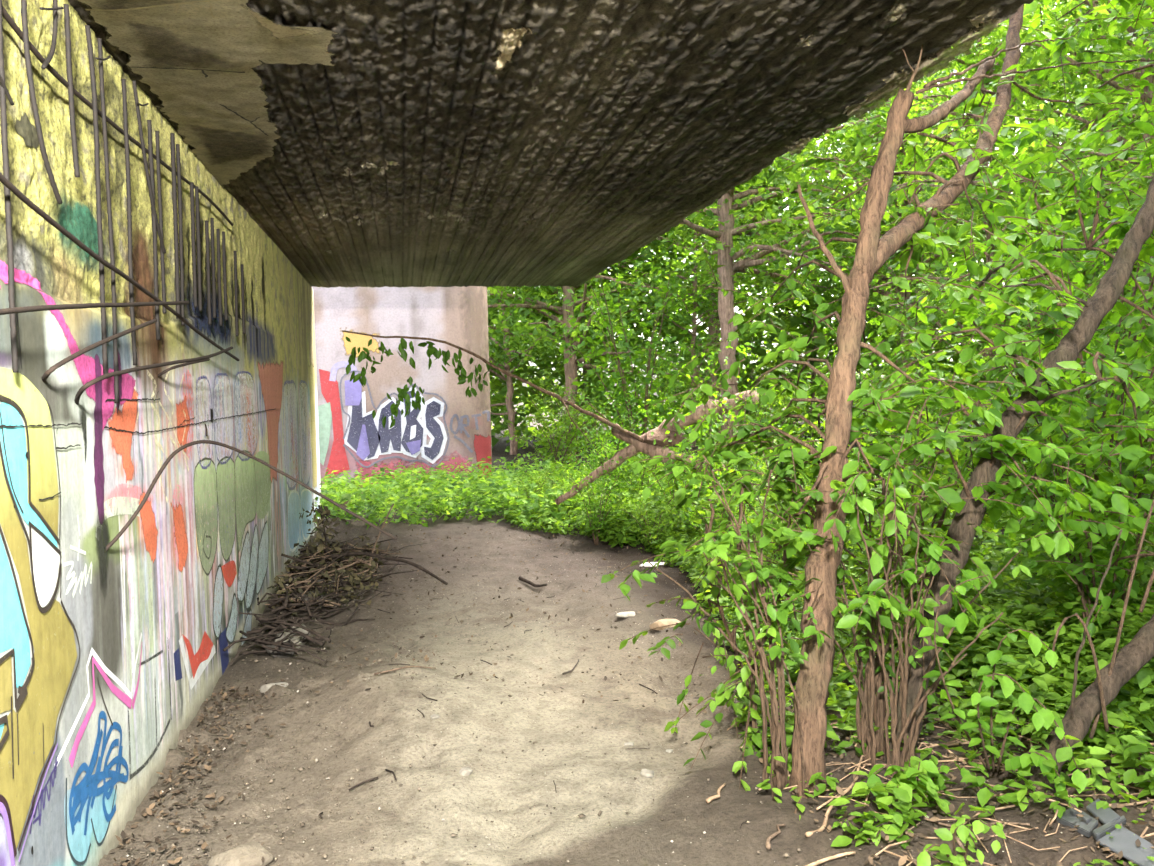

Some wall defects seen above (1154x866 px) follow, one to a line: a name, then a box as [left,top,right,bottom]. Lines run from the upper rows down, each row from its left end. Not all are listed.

spalling [494,27,532,71]
spalling [0,0,339,329]
crack [0,391,276,449]